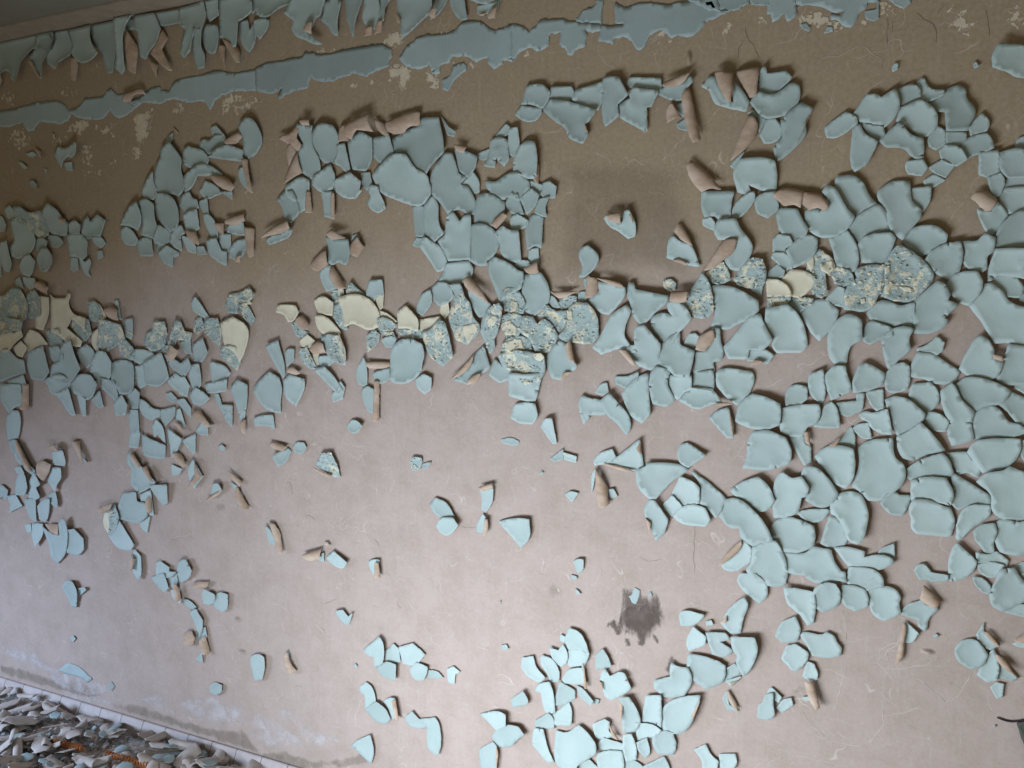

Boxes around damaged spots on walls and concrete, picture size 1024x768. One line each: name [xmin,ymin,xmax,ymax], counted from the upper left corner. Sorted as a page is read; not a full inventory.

peeling [0,0,911,188]
peeling [992,42,1024,78]
peeling [120,117,262,267]
peeling [0,202,255,580]
peeling [253,66,1024,768]
peeling [62,581,86,607]
peeling [151,559,228,663]
water stain [608,592,660,646]